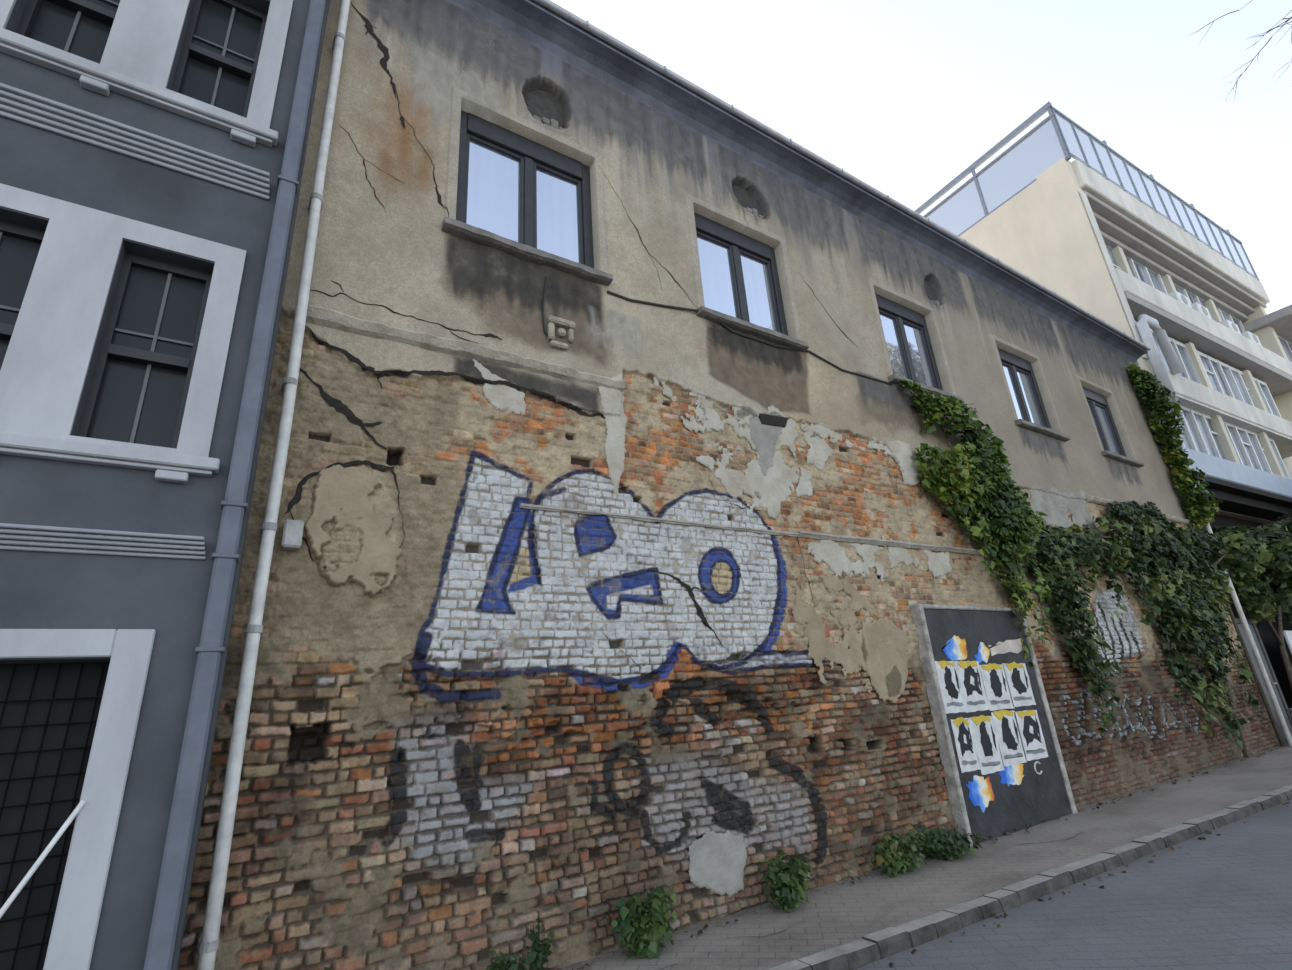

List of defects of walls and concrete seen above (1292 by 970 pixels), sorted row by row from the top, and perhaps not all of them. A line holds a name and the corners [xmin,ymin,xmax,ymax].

crack [338,3,449,217]
damp [373,0,539,94]
crack [598,165,699,308]
crack [313,280,502,344]
crack [285,326,606,562]
peeling [473,359,526,414]
peeling [598,373,627,497]
peeling [653,376,674,401]
peeling [681,390,920,520]
peeling [792,536,951,693]